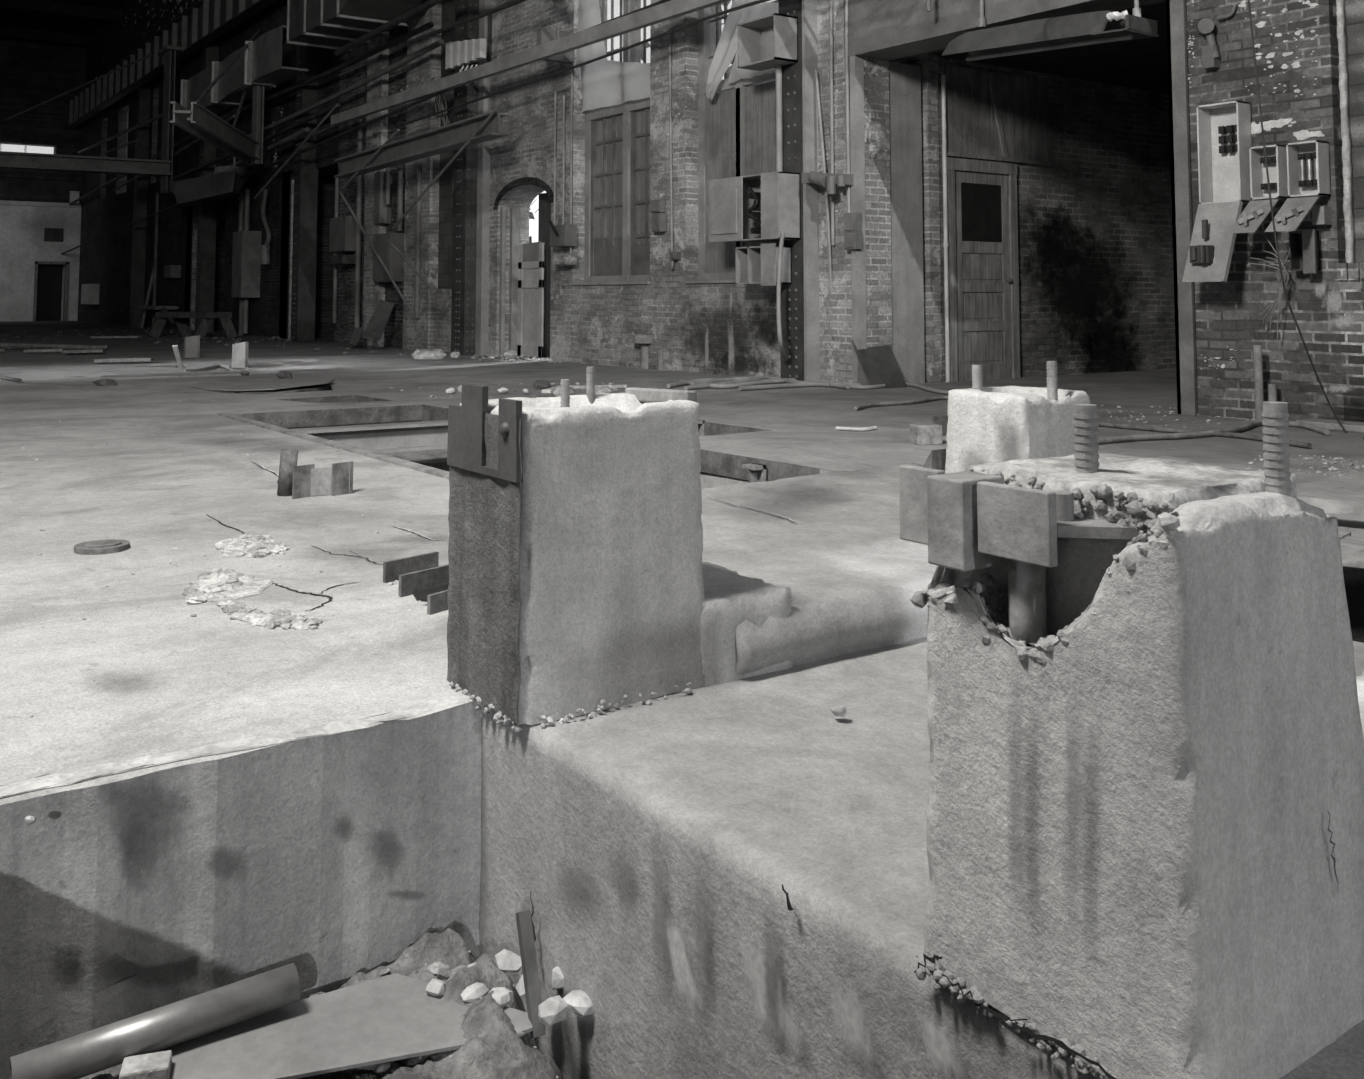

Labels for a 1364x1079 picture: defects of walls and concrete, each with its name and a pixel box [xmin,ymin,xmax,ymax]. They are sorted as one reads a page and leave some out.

spalling [182,533,323,630]
leakage [110,789,171,880]